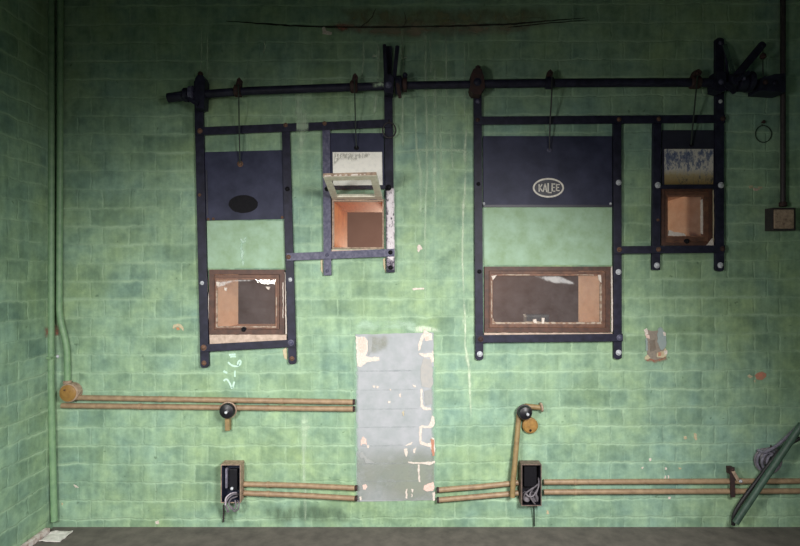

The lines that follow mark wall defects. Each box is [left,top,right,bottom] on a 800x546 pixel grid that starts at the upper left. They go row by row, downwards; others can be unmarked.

peeling [355,336,379,367]
spalling [644,327,668,362]
peeling [404,329,435,501]